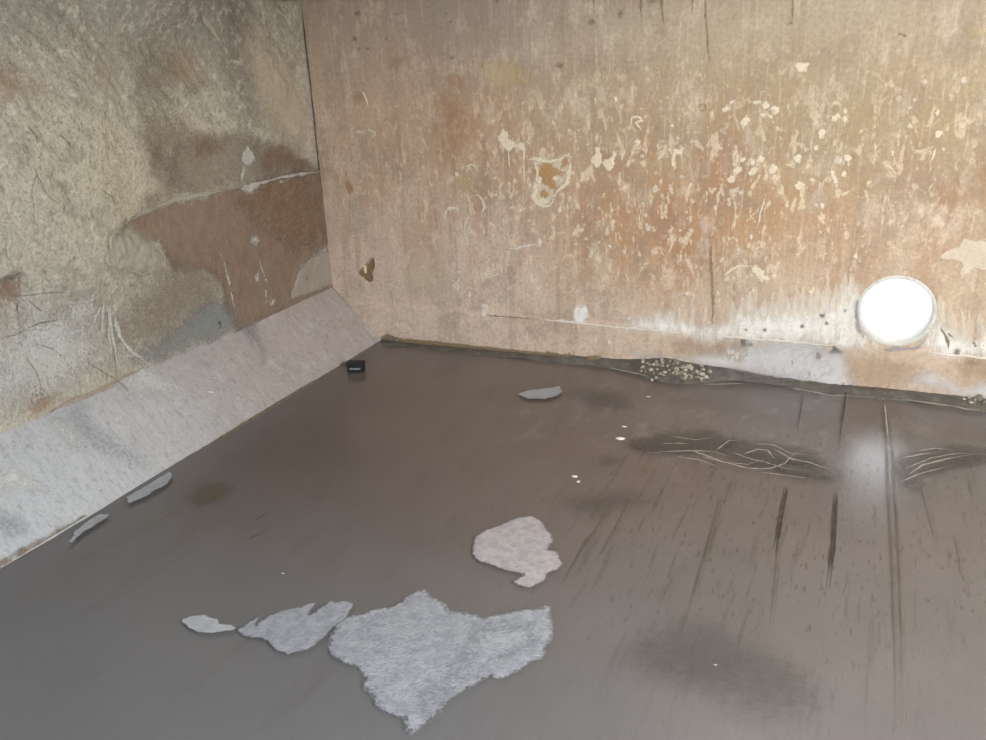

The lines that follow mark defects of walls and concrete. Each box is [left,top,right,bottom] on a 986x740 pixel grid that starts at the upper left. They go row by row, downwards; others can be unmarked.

peeling [490,119,572,208]
peeling [117,170,333,329]
peeling [939,239,986,277]
water stain [633,288,873,385]
water stain [925,324,986,357]
water stain [921,375,986,396]